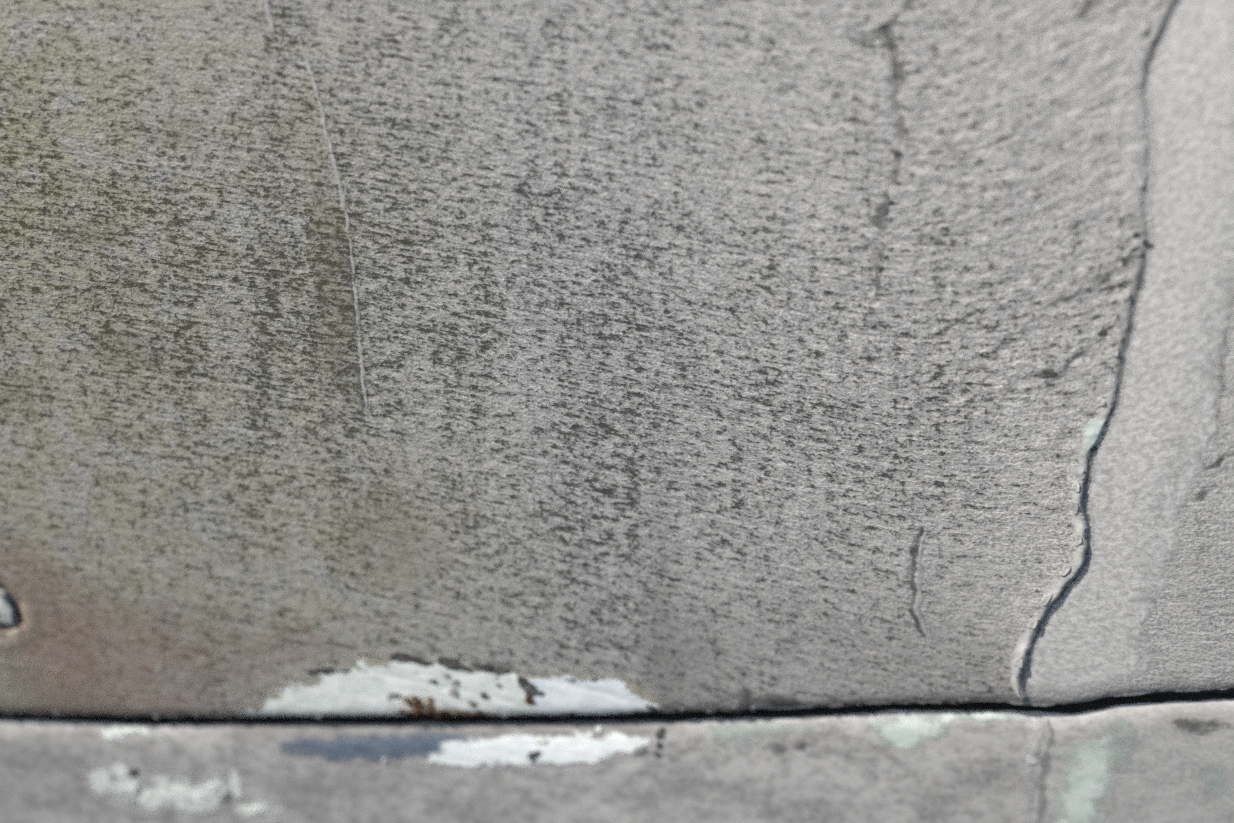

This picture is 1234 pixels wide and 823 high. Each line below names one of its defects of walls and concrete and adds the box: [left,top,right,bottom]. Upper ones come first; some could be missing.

crack [847,0,911,295]
crack [1010,0,1178,823]
crack [1198,454,1234,499]
corrosion [397,695,478,719]
peeling [227,652,665,768]